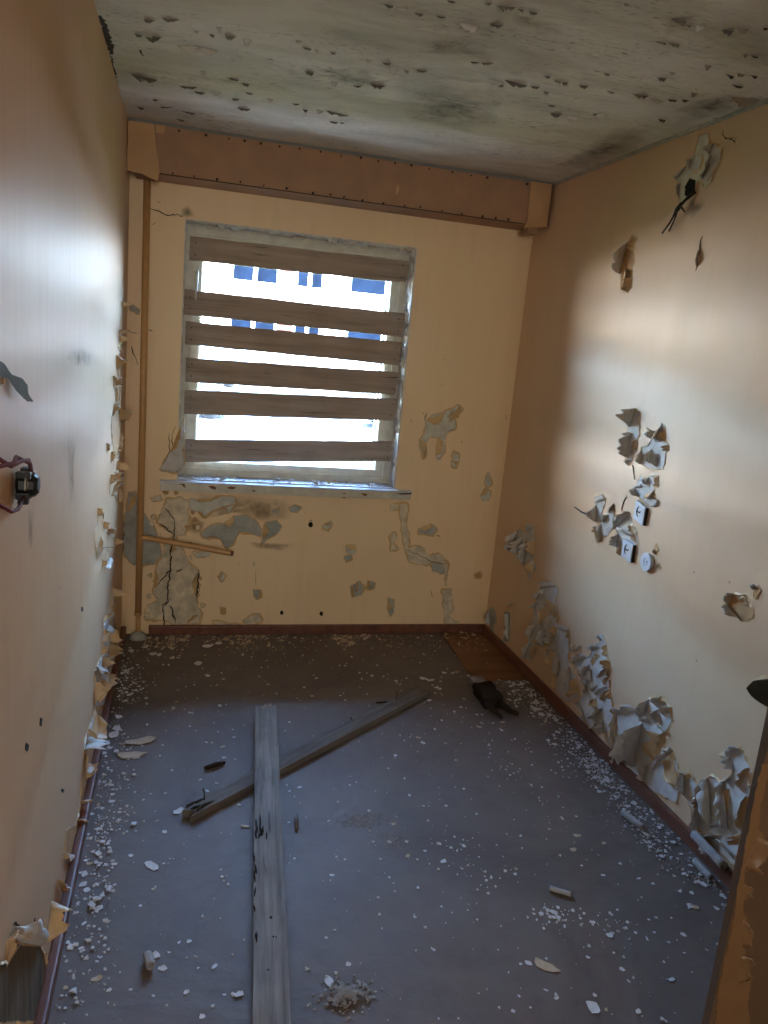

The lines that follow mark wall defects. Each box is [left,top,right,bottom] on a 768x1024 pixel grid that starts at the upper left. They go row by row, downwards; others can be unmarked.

peeling [0,361,34,402]
spalling [95,327,303,625]
peeling [189,221,464,624]
peeling [611,233,638,294]
peeling [585,408,670,556]
spalling [672,133,724,203]
peeling [63,587,127,865]
peeling [484,524,768,875]